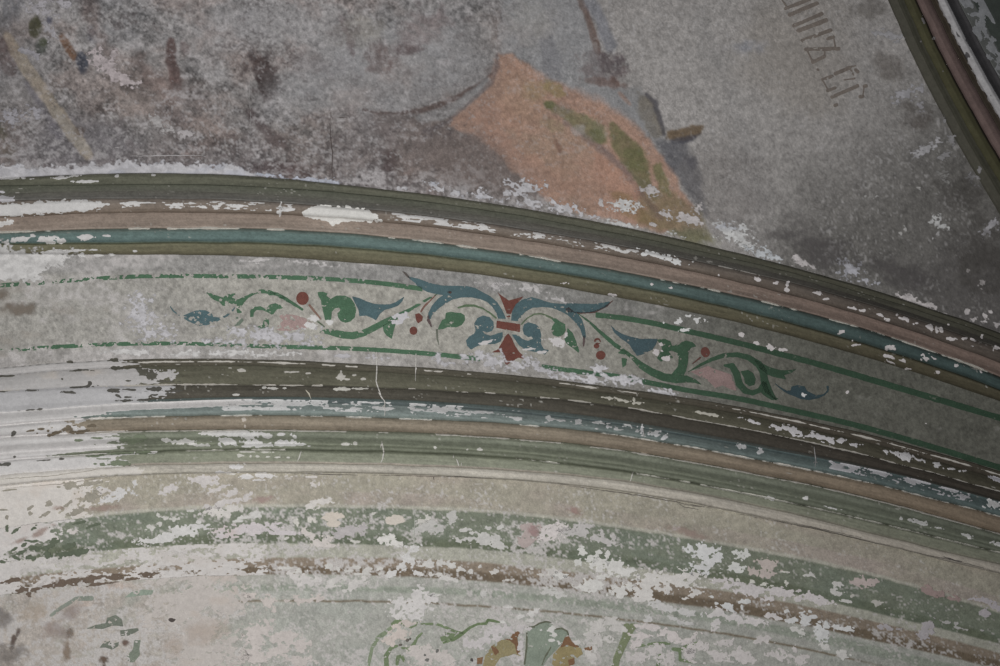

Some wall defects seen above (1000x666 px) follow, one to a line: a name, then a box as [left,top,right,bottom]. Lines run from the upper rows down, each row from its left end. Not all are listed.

peeling [0,159,339,283]
flaking render [162,201,383,231]
peeling [422,177,816,269]
peeling [835,257,881,285]
peeling [522,332,569,354]
peeling [663,315,708,332]
peeling [738,332,788,352]
peeling [847,291,1000,347]
spalling [878,333,988,374]
peeling [540,383,1000,517]
peeling [0,347,880,666]
spalling [591,446,1000,553]